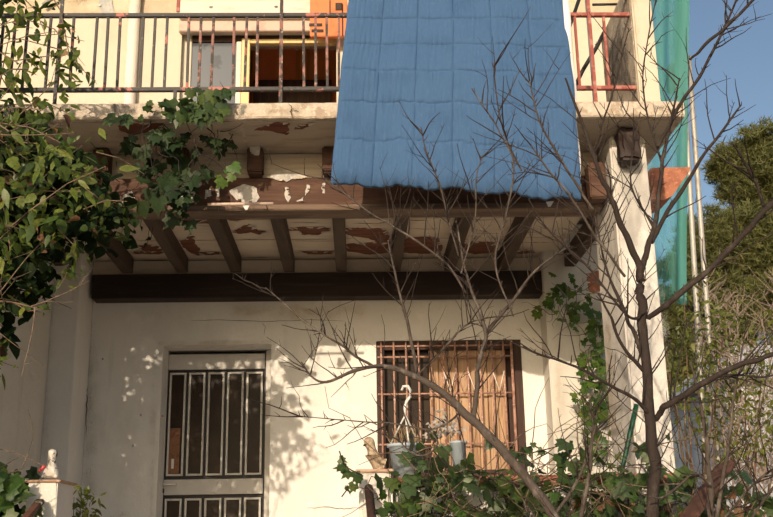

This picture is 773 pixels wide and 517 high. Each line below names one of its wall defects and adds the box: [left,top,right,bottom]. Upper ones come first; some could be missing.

peeling [254,122,316,135]
flaking render [267,169,311,203]
peeling [180,181,267,235]
peeling [180,234,221,256]
peeling [289,226,333,236]
peeling [346,228,390,255]
peeling [403,237,444,254]